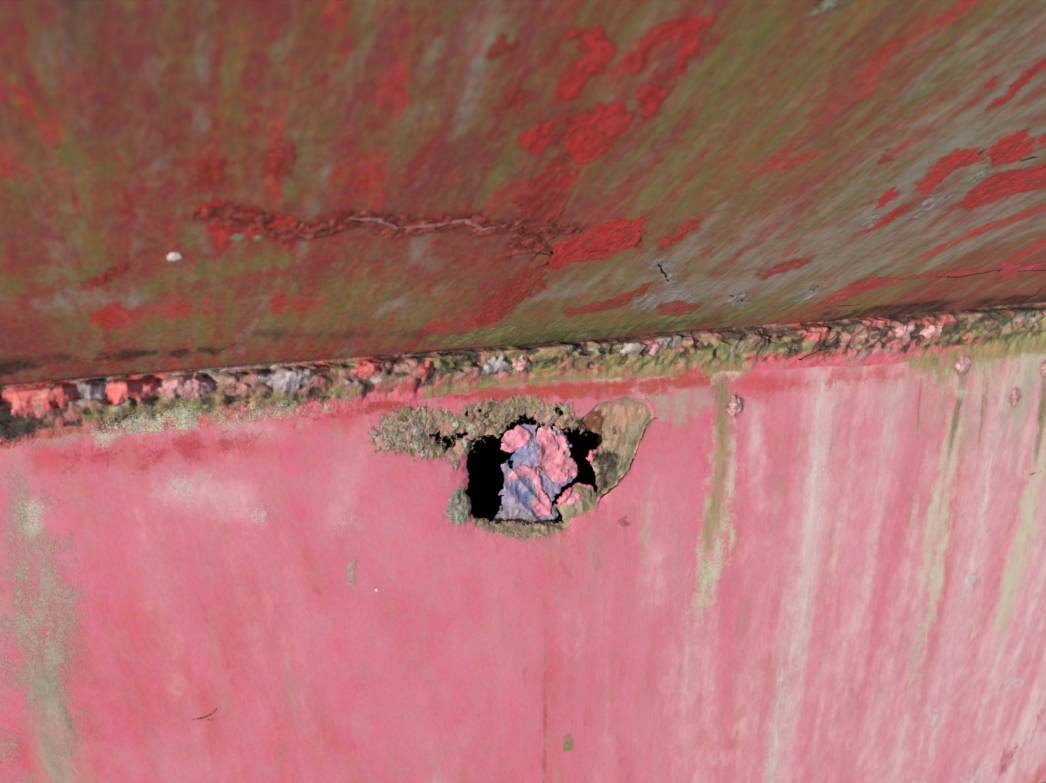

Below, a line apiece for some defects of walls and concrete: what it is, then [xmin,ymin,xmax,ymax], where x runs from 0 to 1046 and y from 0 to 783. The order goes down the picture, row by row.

peeling [980,58,1046,110]
crack [182,132,588,249]
peeling [474,12,720,330]
peeling [860,128,1046,233]
peeling [753,254,814,280]
peeling [795,283,865,309]
peeling [53,427,270,477]
spalling [287,364,737,524]
damp [905,329,1046,588]
damp [761,370,832,783]